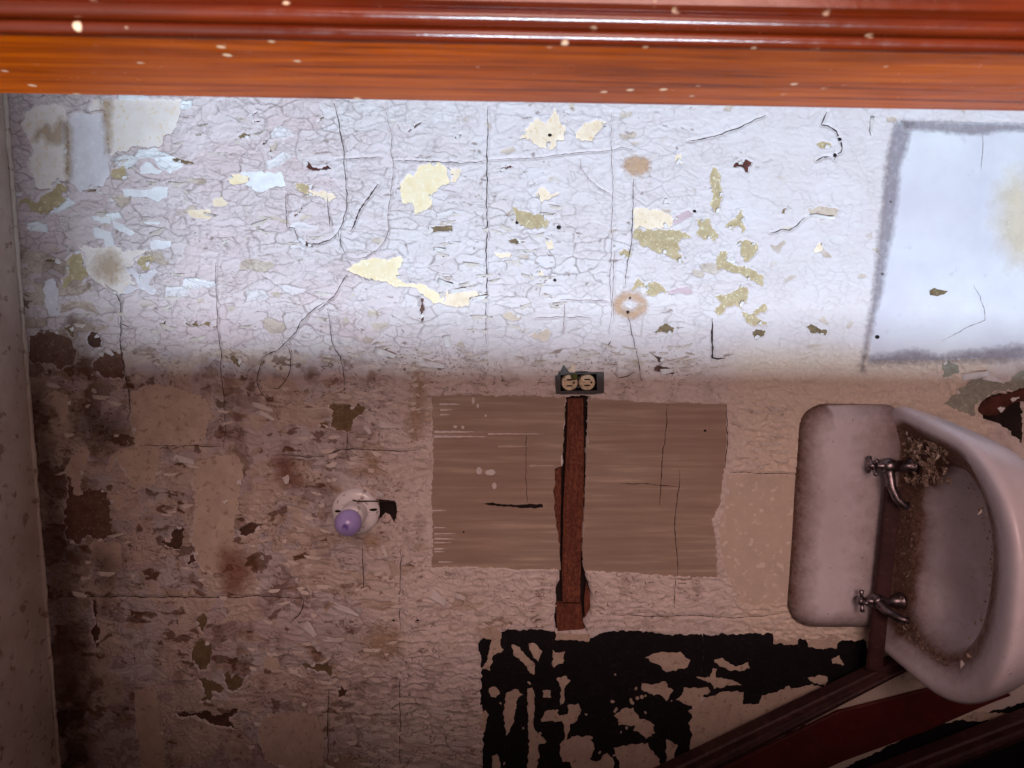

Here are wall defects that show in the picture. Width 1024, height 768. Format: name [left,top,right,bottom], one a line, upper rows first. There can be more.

flaking render [19,99,208,218]
flaking render [520,109,606,150]
crack [692,116,764,141]
spalling [734,159,752,172]
crack [816,112,842,161]
crack [257,104,642,403]
crack [105,284,131,420]
flaking render [28,313,260,582]
crack [142,263,226,447]
flaking render [294,162,796,630]
crack [711,321,725,360]
peeling [944,370,1024,443]